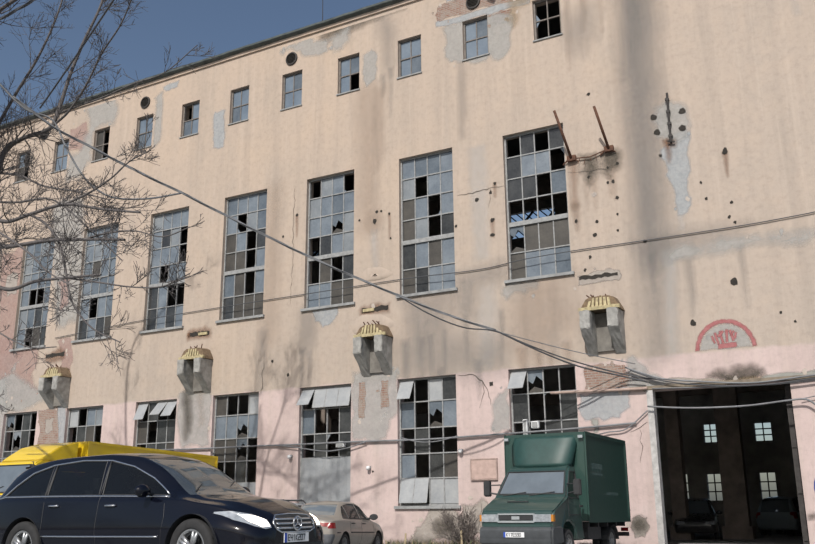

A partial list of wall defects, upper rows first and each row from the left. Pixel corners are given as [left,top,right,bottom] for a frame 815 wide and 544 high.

spalling [432,0,518,28]
flaking render [0,248,73,394]
spalling [358,382,366,424]
spalling [376,367,398,408]
water stain [713,367,815,385]